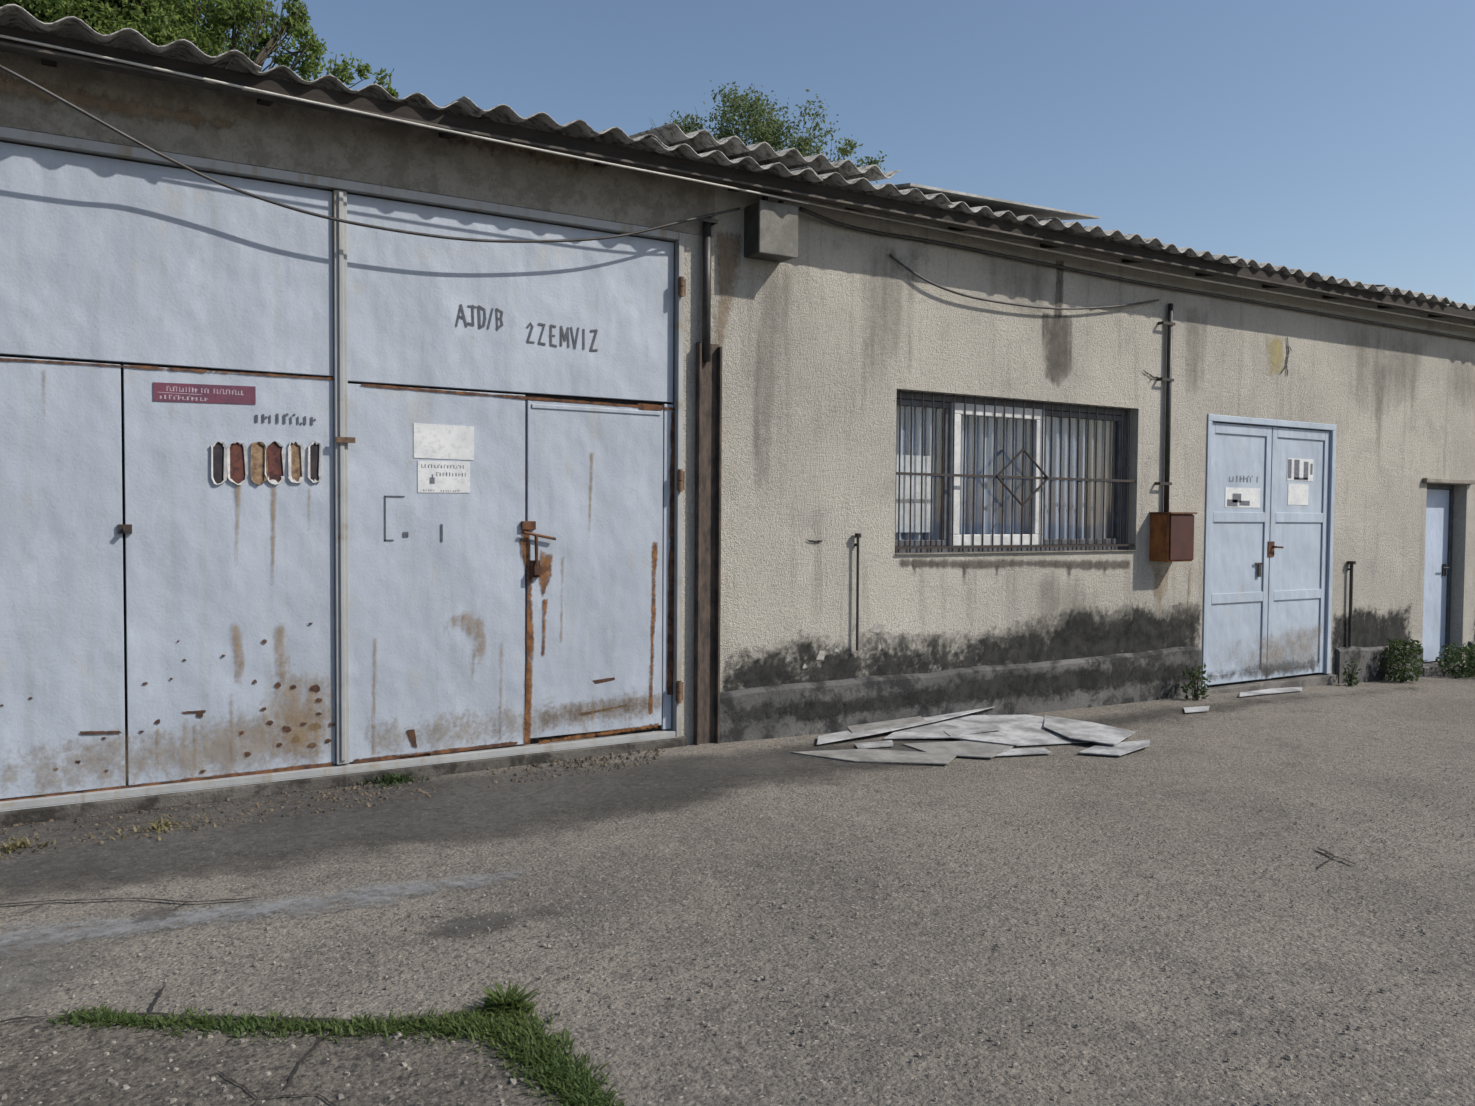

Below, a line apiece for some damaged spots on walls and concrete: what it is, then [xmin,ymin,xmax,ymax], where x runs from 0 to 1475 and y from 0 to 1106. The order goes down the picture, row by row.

damp [1043,261,1072,382]
rust [353,384,675,764]
rust [0,627,335,802]
mould [724,603,1411,723]